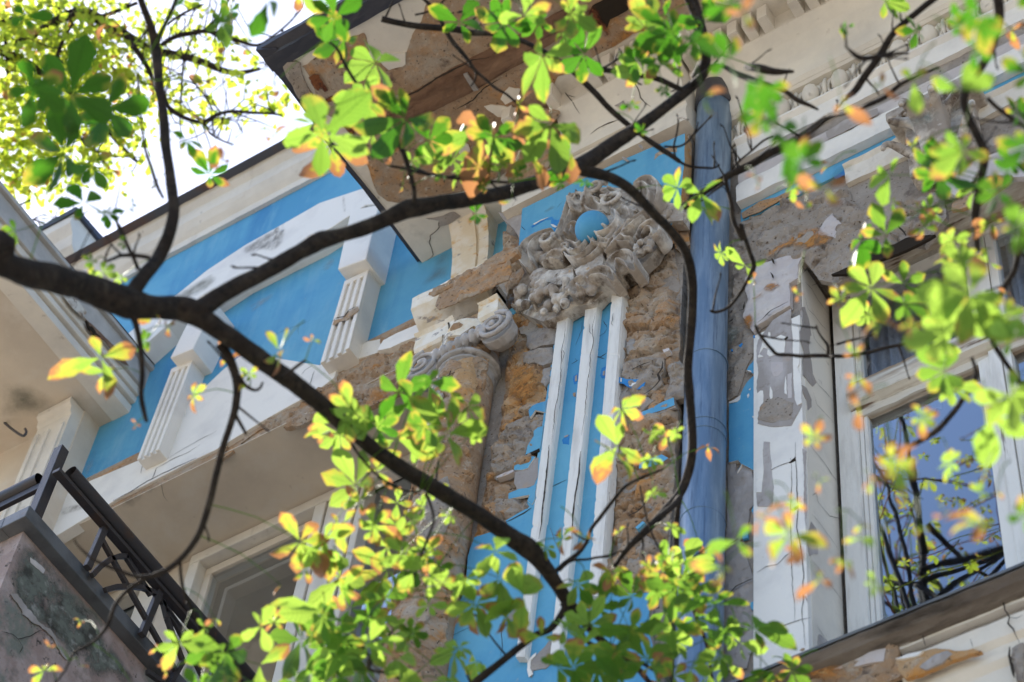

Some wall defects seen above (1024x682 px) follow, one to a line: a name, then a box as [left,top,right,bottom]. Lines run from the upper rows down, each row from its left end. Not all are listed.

flaking render [303,0,649,203]
flaking render [645,0,704,26]
flaking render [410,212,560,523]
crack [506,316,613,543]
flaking render [607,229,691,593]
flaking render [724,170,1013,672]
flaking render [810,644,984,682]